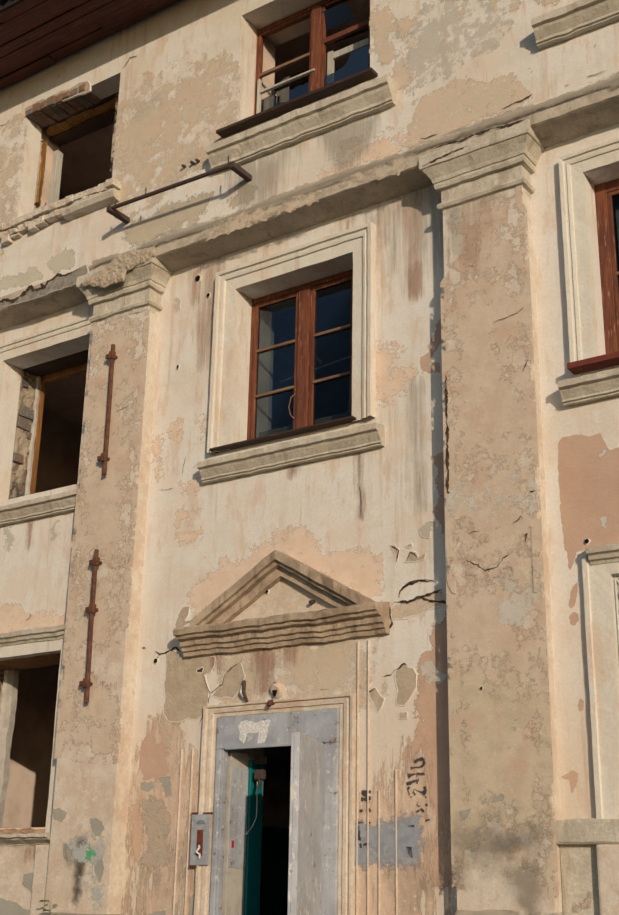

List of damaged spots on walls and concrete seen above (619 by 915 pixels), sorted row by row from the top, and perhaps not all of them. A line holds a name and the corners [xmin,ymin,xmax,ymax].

peeling [369,5,424,92]
peeling [0,52,321,309]
peeling [316,72,534,185]
crack [422,95,531,166]
crack [0,266,83,304]
crack [443,374,451,493]
peeling [0,309,184,764]
peeling [121,185,579,915]
crack [389,579,446,629]
crack [467,516,528,571]
peeling [558,433,619,569]
water stain [74,861,84,900]